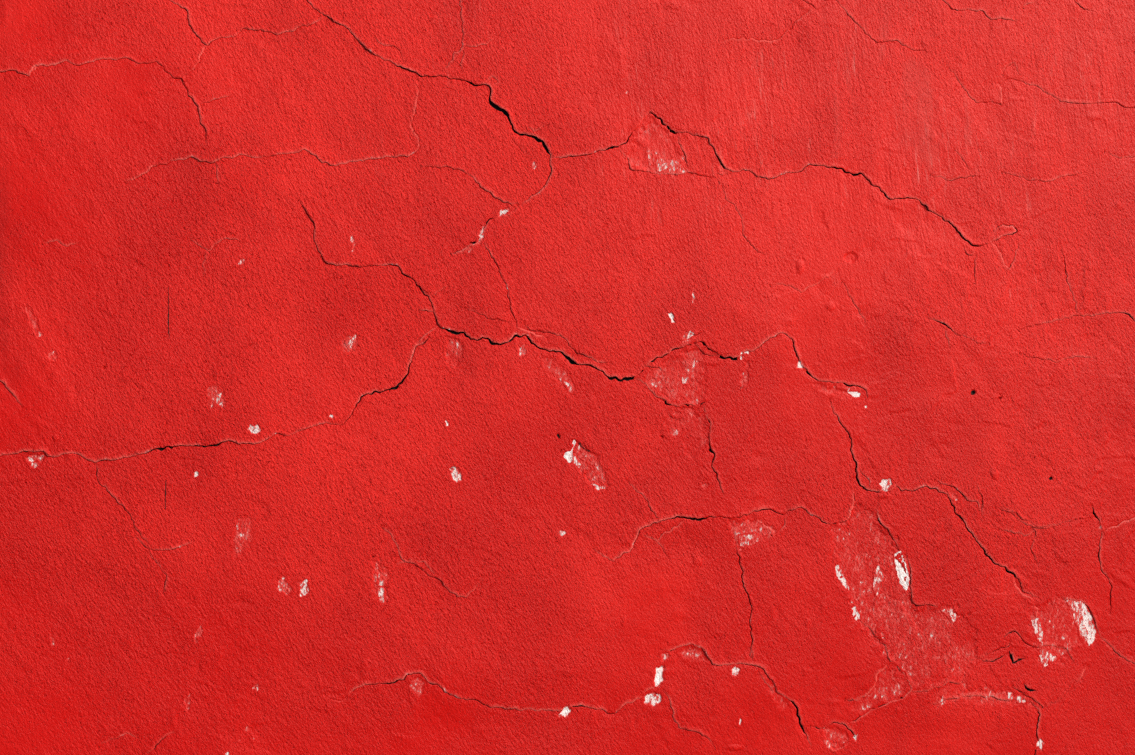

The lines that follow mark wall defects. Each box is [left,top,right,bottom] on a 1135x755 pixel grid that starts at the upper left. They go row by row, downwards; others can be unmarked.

crack [719,0,1135,111]
crack [0,0,1021,600]
crack [1018,249,1135,365]
peeling [557,434,612,494]
crack [591,398,1135,755]
peeling [827,476,1037,716]
peeling [1027,593,1102,677]
crack [326,669,717,750]